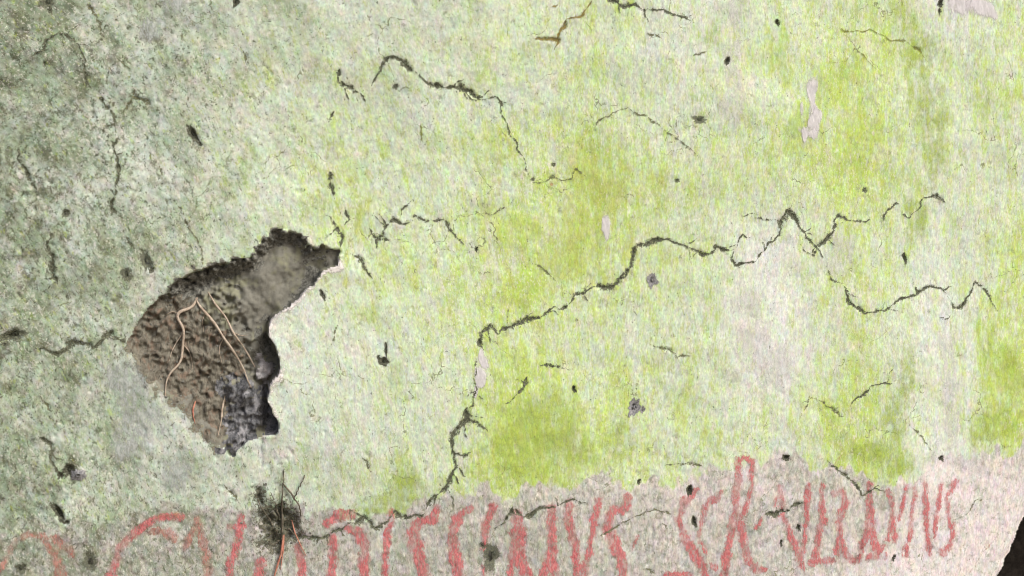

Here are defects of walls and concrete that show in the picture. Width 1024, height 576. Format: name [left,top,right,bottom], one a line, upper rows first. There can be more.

crack [535,0,691,50]
crack [329,55,582,183]
crack [328,171,464,278]
spalling [108,226,344,460]
crack [299,193,998,550]